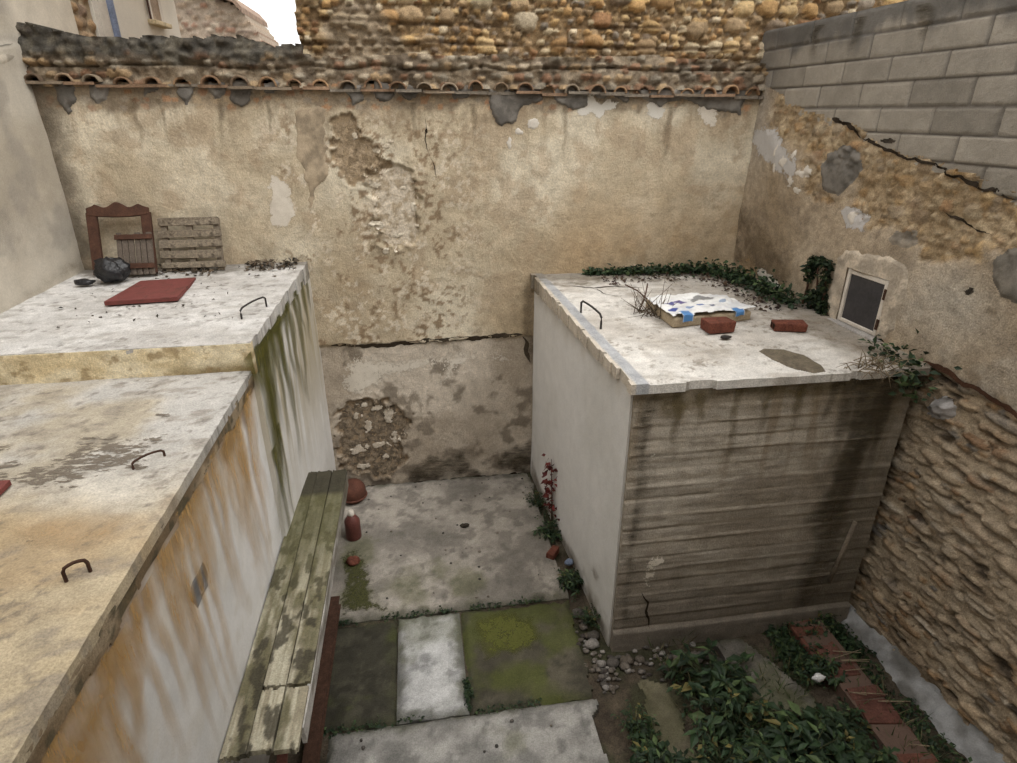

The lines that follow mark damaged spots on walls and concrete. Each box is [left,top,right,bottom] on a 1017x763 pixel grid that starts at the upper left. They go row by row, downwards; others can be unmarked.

peeling [267,175,296,228]
peeling [332,114,420,254]
peeling [752,125,812,194]
crack [832,117,1016,200]
crack [942,210,989,234]
crack [331,333,530,362]
damp [246,280,309,509]
spalling [333,399,412,481]
damp [644,555,674,587]
crack [642,594,650,626]